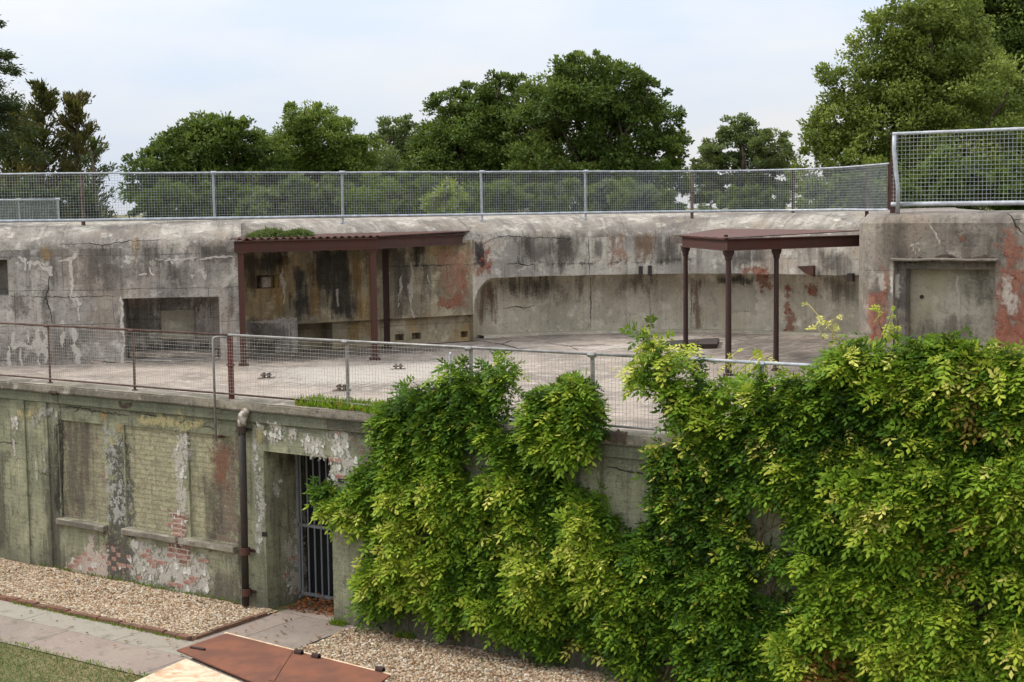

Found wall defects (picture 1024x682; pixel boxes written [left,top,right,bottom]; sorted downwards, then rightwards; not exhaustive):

crack [12,276,115,320]
crack [59,239,169,251]
water stain [139,238,371,339]
crack [390,235,611,352]
peeling [905,226,1024,350]
spalling [65,421,372,604]